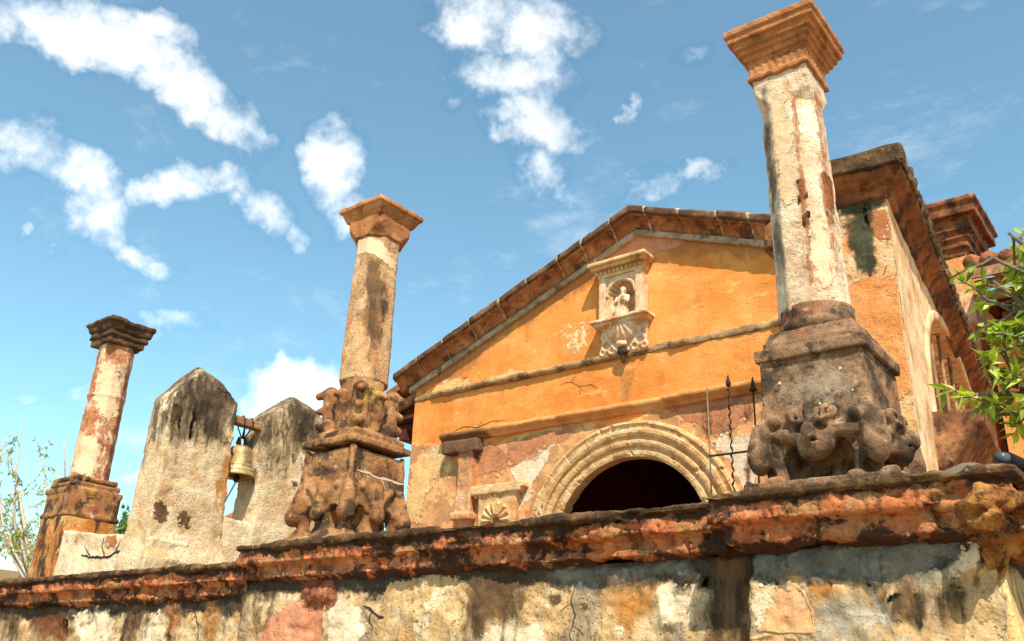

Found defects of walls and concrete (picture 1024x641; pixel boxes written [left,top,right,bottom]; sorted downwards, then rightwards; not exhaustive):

peeling [808,219,838,290]
leakage [841,198,884,274]
leakage [364,259,387,347]
peeling [554,320,590,355]
peeling [70,361,121,477]
leakage [165,379,229,441]
crack [359,470,404,490]
peeling [479,428,570,511]
spalling [259,595,368,641]
crack [363,605,384,629]
crack [562,586,584,641]
leakage [707,540,963,641]